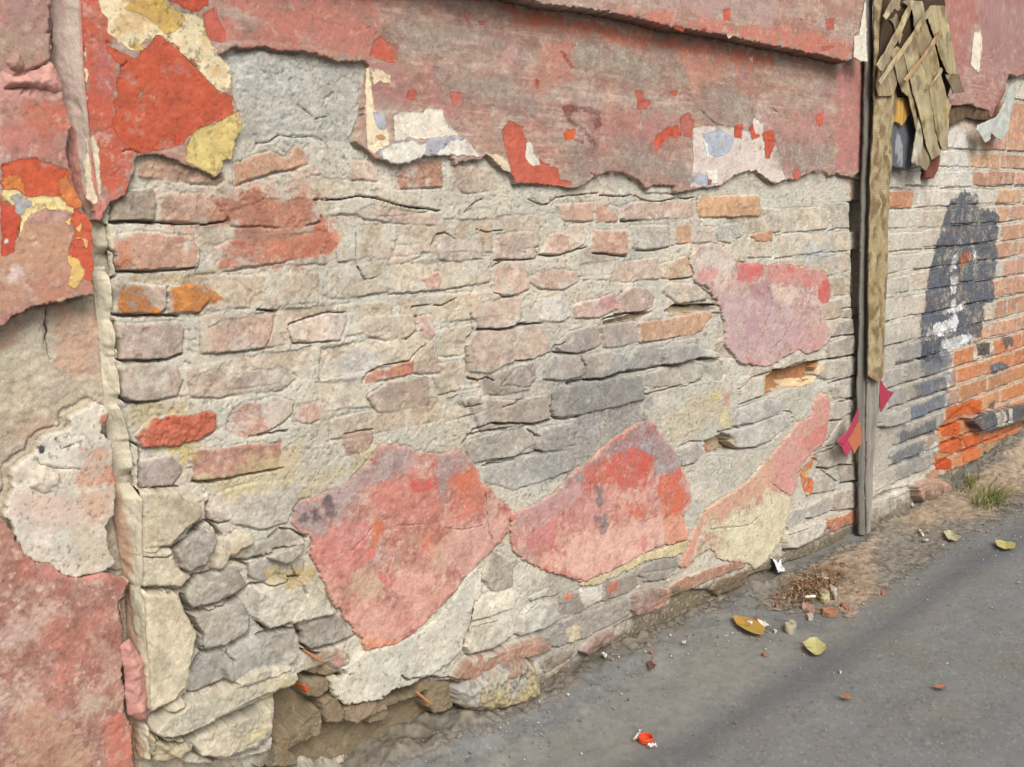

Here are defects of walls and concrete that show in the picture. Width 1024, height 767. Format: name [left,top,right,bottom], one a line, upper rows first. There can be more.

peeling [971,30,982,72]
peeling [99,0,572,186]
peeling [635,90,650,109]
peeling [650,113,801,187]
peeling [0,135,101,288]
crack [314,195,484,213]
crack [41,310,49,353]
spalling [144,412,216,448]
peeling [1,401,116,578]
peeling [271,242,831,767]